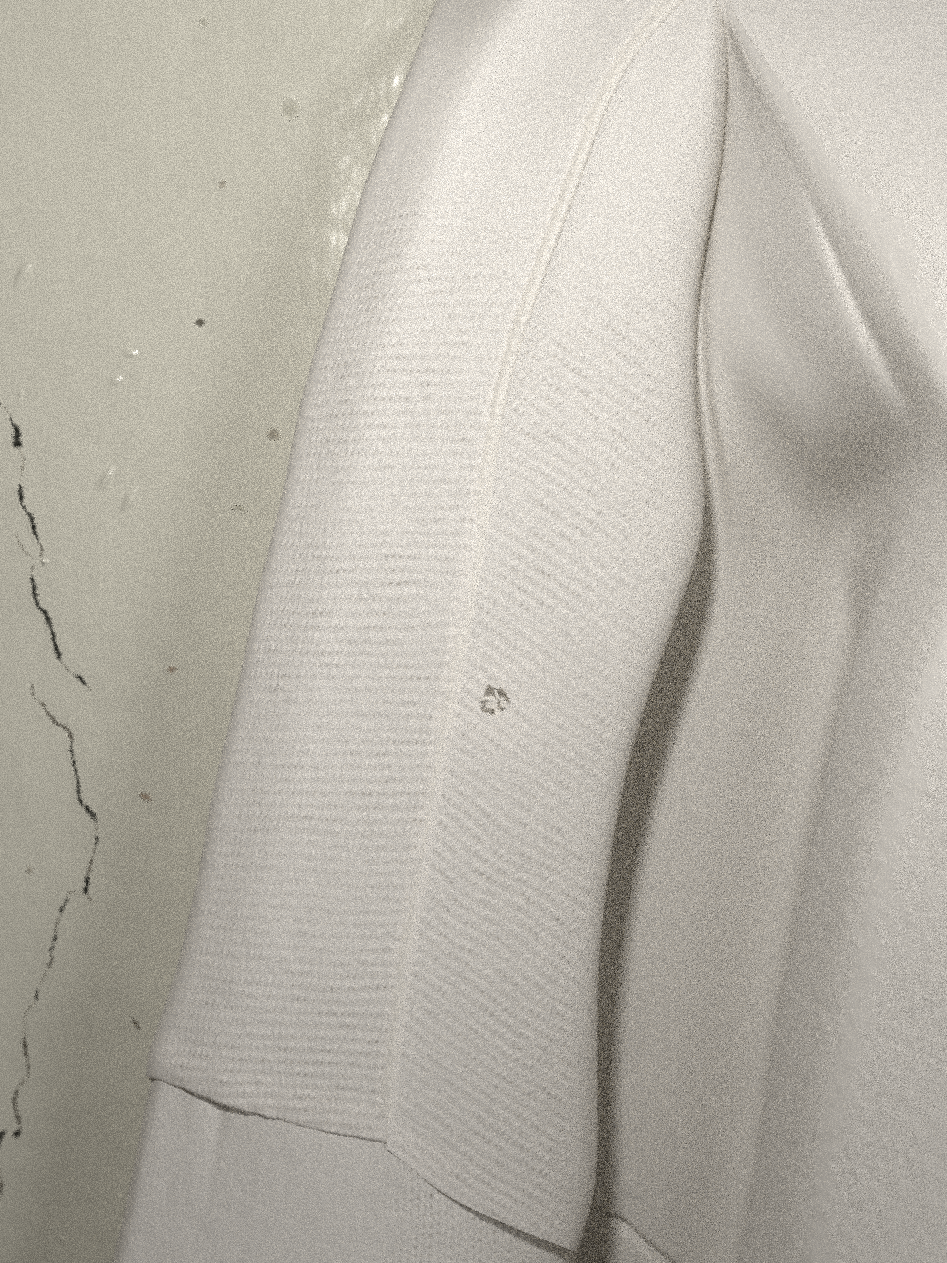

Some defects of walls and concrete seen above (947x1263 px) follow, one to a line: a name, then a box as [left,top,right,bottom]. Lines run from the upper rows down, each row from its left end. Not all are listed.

crack [0,403,86,685]
crack [0,682,99,1199]